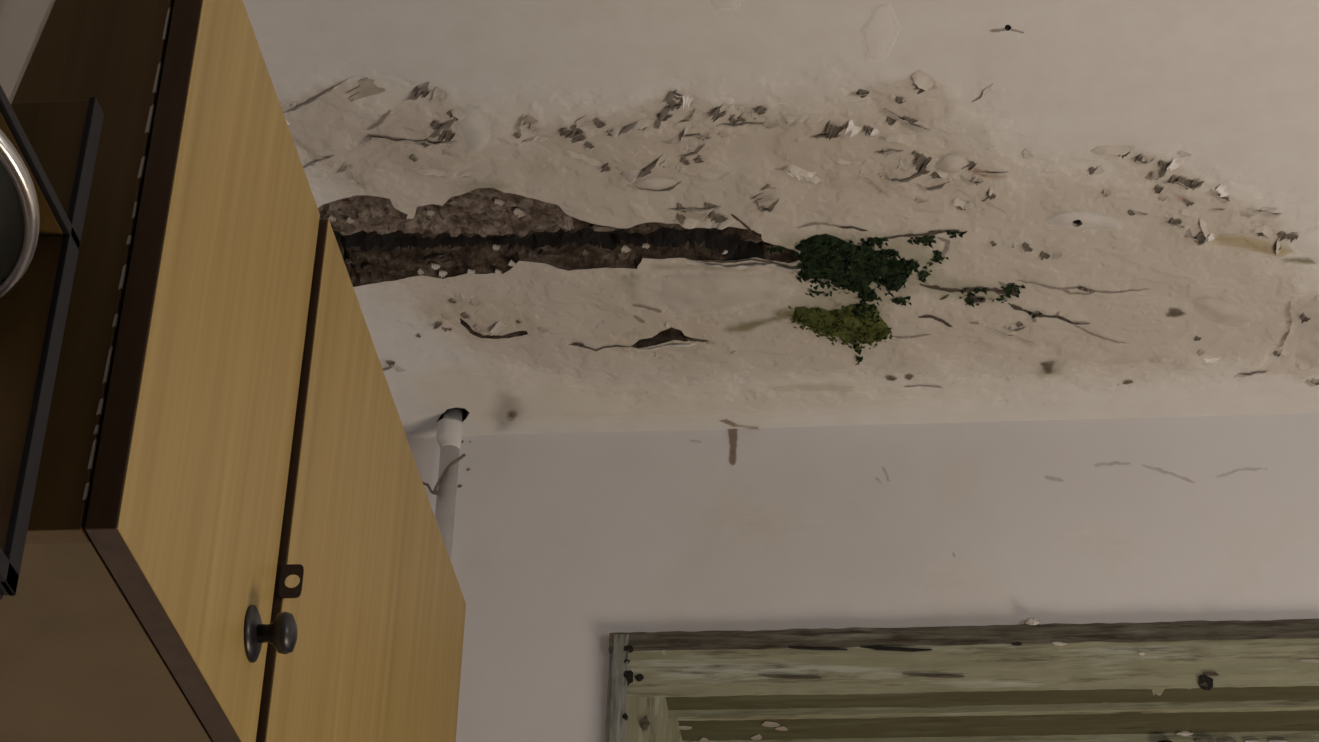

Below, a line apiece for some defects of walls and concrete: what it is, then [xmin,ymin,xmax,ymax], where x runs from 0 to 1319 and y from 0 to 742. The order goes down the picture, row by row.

flaking render [283,70,1009,287]
peeling [1089,145,1299,257]
damp [339,105,1317,388]
peeling [991,241,1063,260]
peeling [416,298,521,338]
peeling [1233,301,1319,387]
corrosion [721,420,758,465]